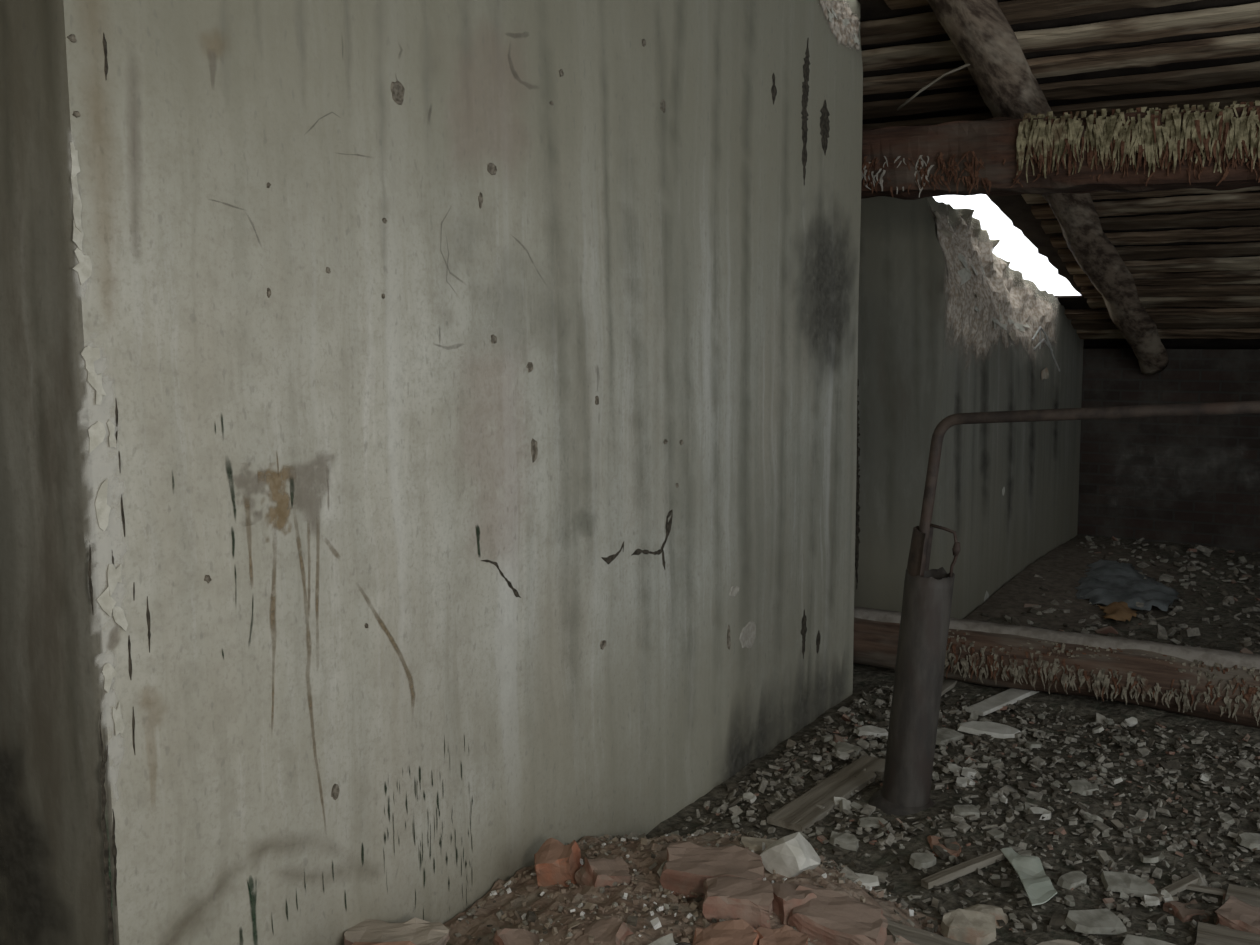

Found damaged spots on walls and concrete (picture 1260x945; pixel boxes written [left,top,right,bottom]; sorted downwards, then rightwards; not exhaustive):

spalling [819,0,860,50]
spalling [70,142,92,296]
spalling [931,211,1057,359]